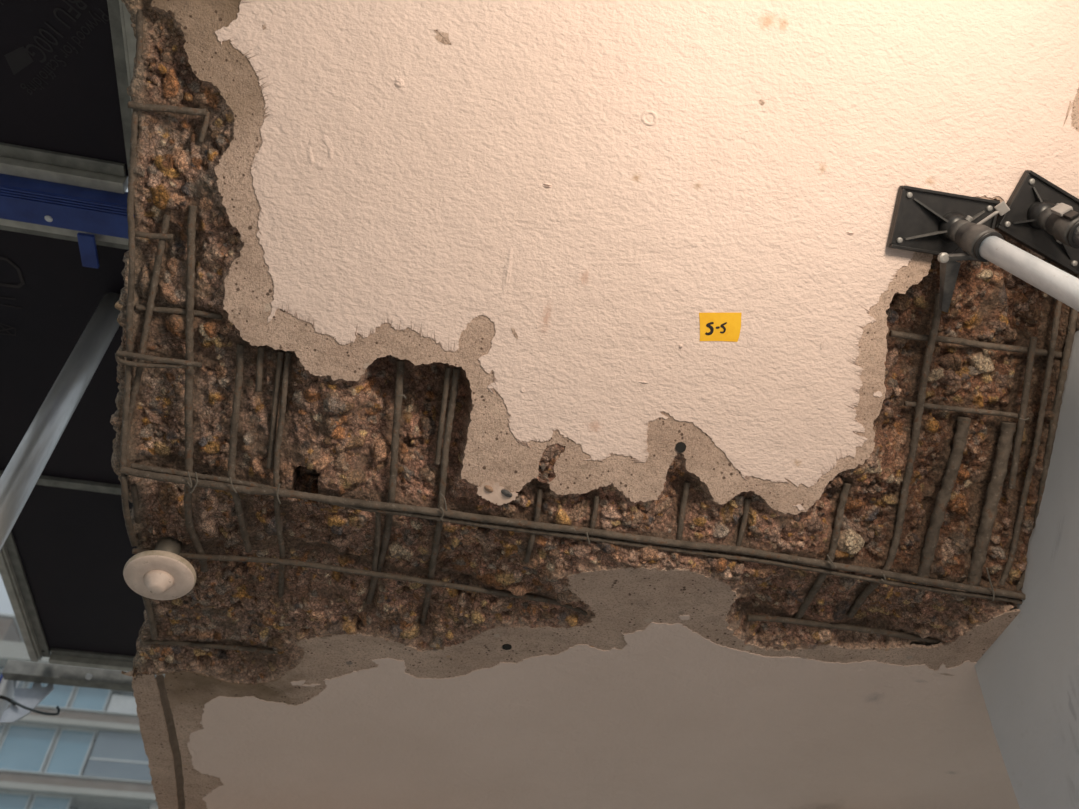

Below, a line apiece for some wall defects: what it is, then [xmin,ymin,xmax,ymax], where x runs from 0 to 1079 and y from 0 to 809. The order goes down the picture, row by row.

spalling [110,250,1022,809]
spalling [121,0,1079,600]